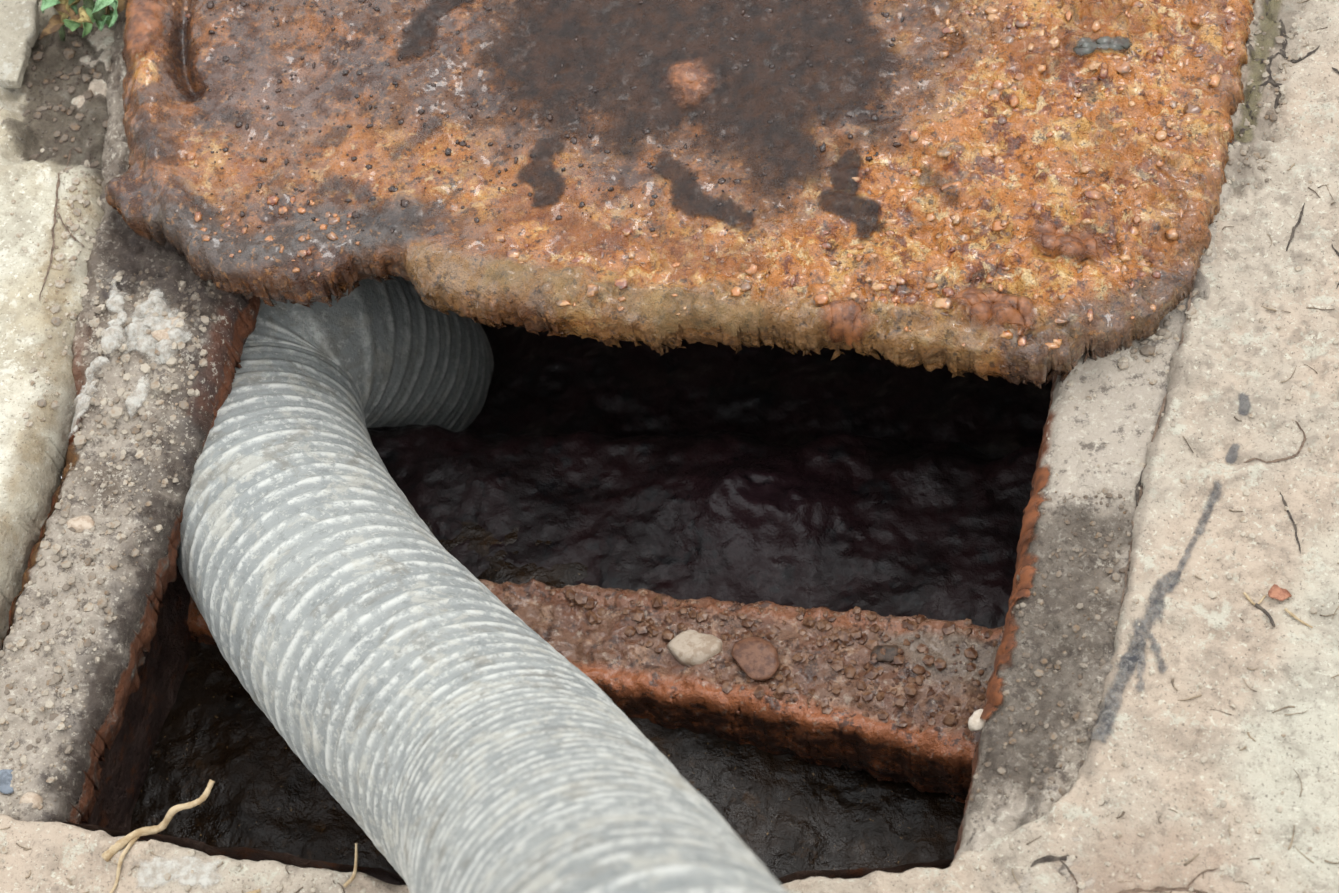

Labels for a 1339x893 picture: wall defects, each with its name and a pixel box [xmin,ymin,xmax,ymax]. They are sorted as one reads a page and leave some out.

corrosion [1,445,78,650]
corrosion [980,466,1050,720]
water stain [1092,481,1221,742]
crack [1031,855,1079,893]
crack [1118,868,1218,893]